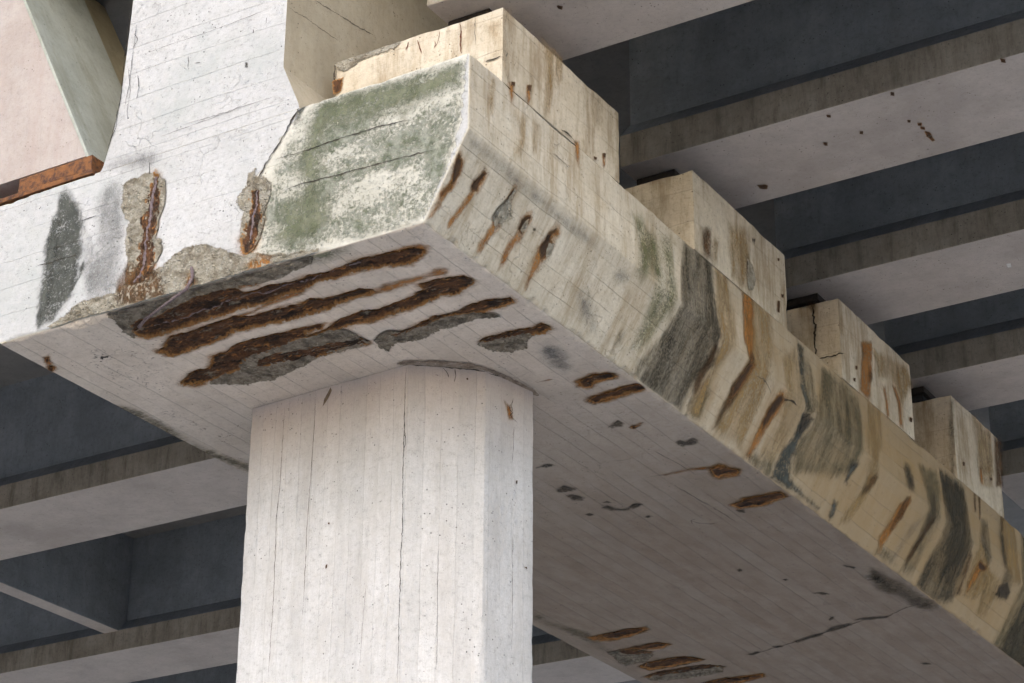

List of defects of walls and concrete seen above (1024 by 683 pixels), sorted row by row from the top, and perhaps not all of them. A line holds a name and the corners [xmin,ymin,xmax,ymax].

corrosion [430,154,463,216]
leakage [37,189,120,328]
spalling [47,106,515,387]
corrosion [479,187,532,264]
corrosion [526,228,559,290]
spalling [478,323,551,353]
leakage [639,229,734,417]
crack [809,303,844,359]
spalling [397,360,539,396]
leakage [749,344,863,496]
leakage [872,465,1024,667]
crack [749,603,923,655]